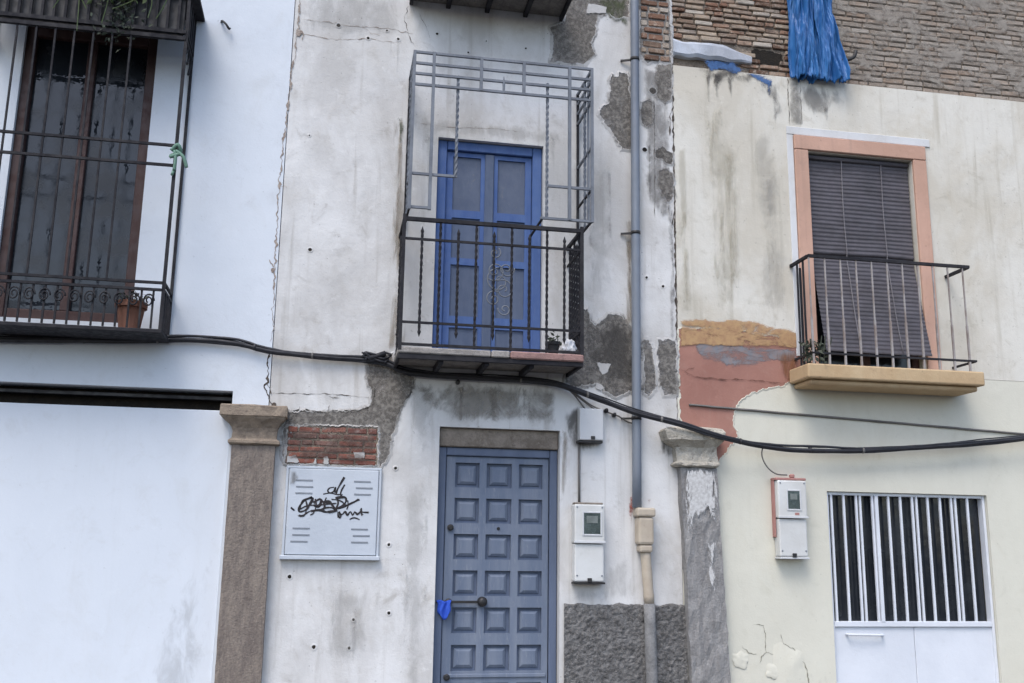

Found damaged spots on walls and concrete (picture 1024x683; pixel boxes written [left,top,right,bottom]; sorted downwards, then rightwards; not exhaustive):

spalling [547,0,676,204]
leakage [706,60,772,95]
crack [263,0,430,413]
spalling [279,351,416,471]
peeling [562,306,803,528]
crack [745,624,809,683]